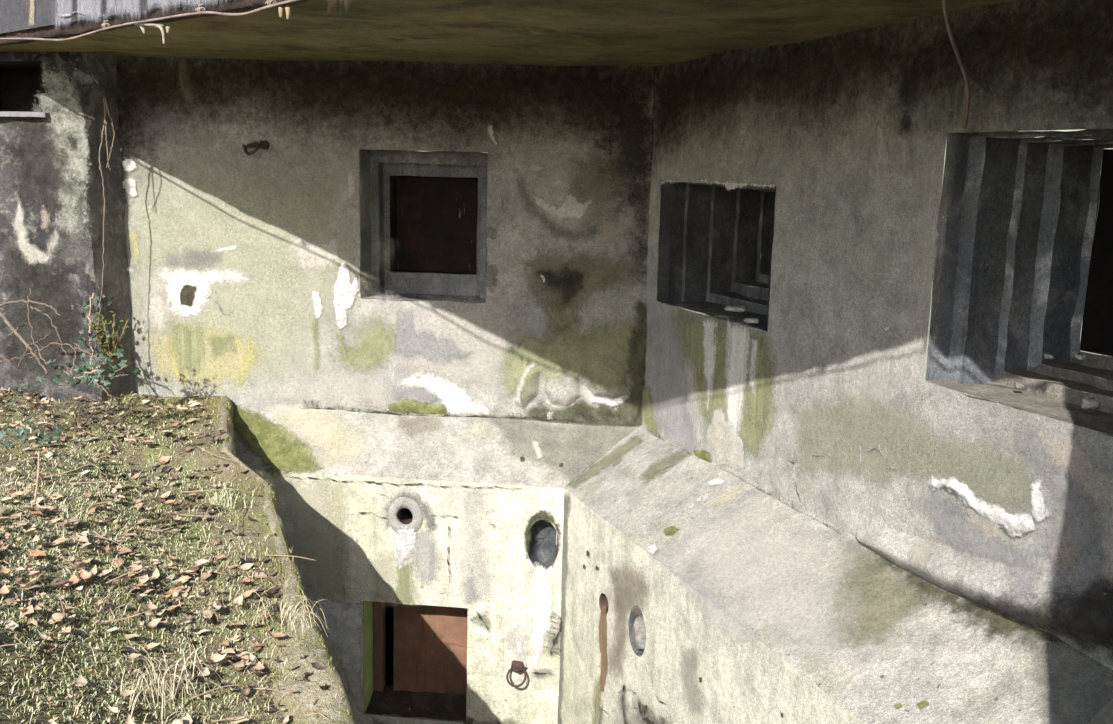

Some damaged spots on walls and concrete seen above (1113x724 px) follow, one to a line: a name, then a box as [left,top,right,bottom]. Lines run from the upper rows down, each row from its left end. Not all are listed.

damp [116,0,1113,276]
spalling [14,206,58,263]
peeling [149,266,249,327]
damp [132,179,345,375]
peeling [291,238,359,329]
peeling [274,371,490,416]
peeling [394,311,469,363]
damp [683,318,769,443]
peeling [1015,429,1113,612]
rust [593,605,608,724]
crack [603,684,664,724]
damp [682,509,1113,724]